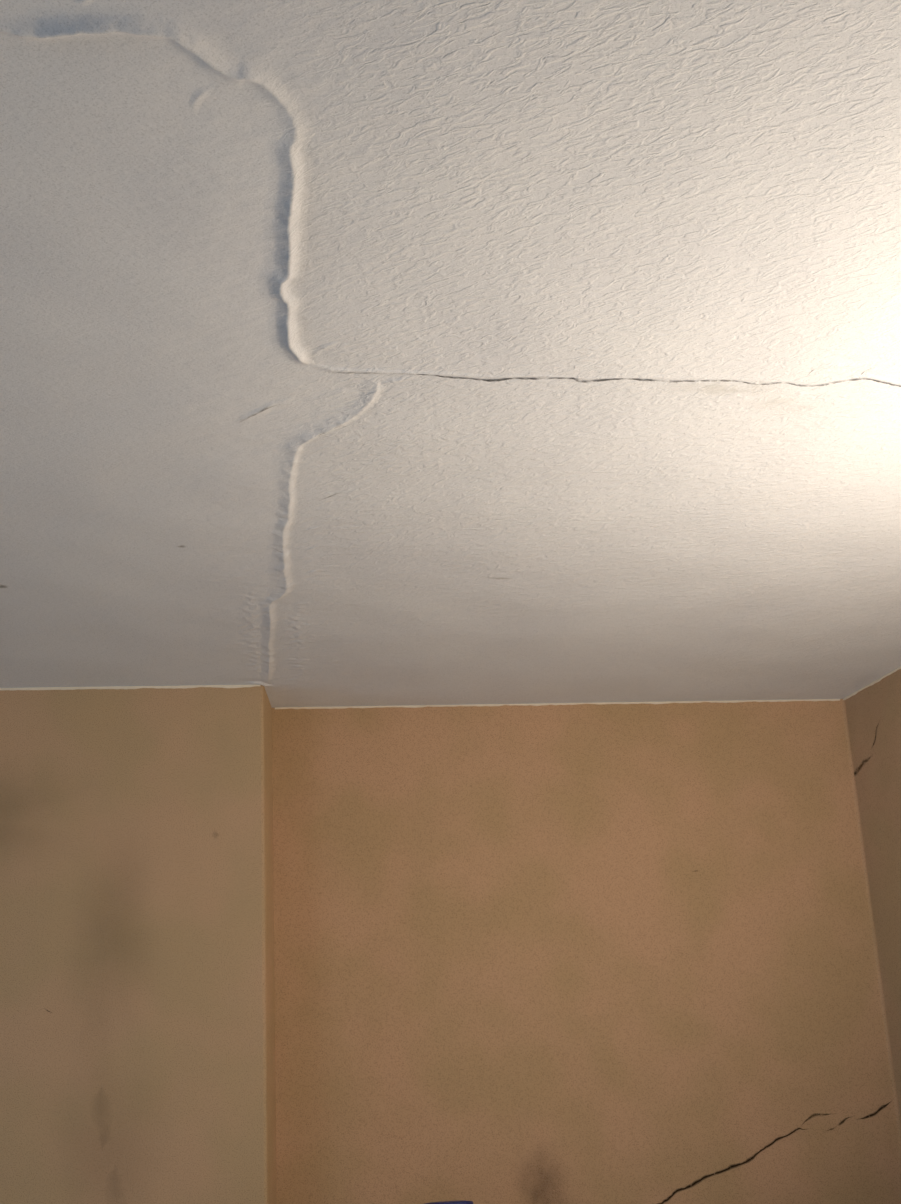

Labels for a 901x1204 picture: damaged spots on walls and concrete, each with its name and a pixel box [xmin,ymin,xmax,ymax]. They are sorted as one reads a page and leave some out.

crack [312,361,901,387]
crack [658,1102,890,1204]